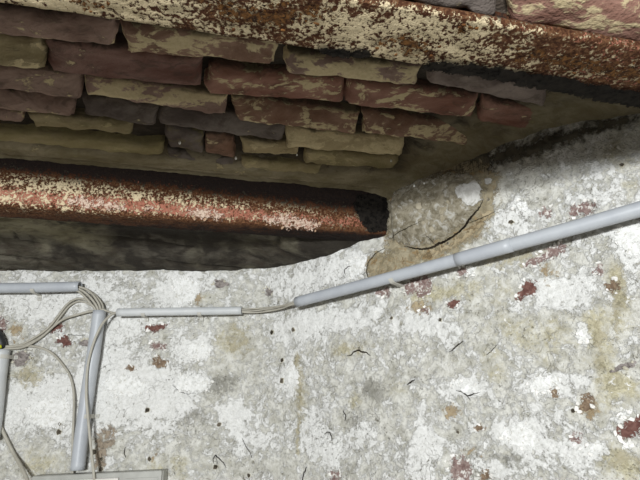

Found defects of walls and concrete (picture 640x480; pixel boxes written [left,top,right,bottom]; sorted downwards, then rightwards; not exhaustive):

rust [63,0,110,13]
rust [197,0,337,33]
rust [455,24,479,35]
rust [371,33,441,57]
peeling [62,195,126,213]
peeling [185,206,228,222]
peeling [262,212,323,232]
flaking render [568,198,598,220]
crack [344,200,494,277]
peeling [612,219,640,258]
flaking render [522,239,567,269]
peeling [345,256,367,279]